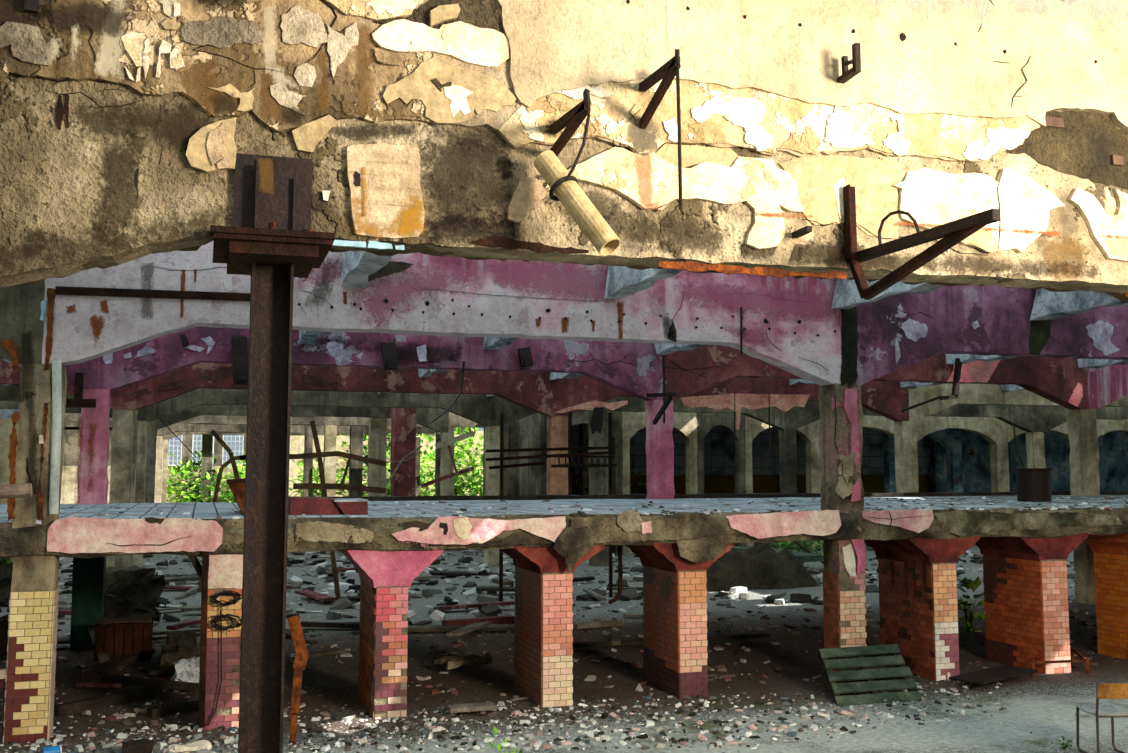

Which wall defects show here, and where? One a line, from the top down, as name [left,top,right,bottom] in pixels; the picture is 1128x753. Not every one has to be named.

water stain [261,70,304,125]
water stain [330,26,518,248]
flaking render [0,0,1128,262]
water stain [0,59,236,318]
corrosion [259,160,273,192]
spalling [367,241,414,282]
water stain [353,261,472,326]
water stain [588,193,722,252]
spalling [658,261,847,279]
corrosion [982,228,1060,236]
peeling [895,318,928,364]
flaking render [392,388,1122,577]